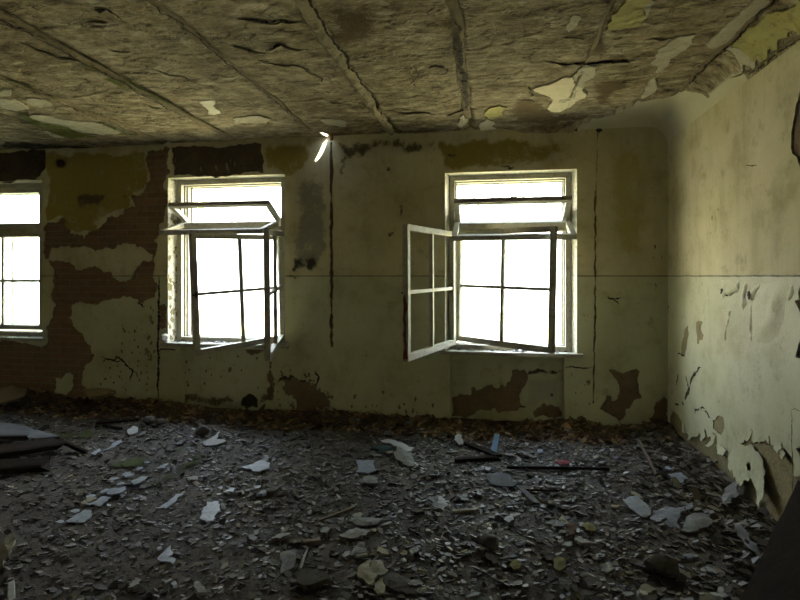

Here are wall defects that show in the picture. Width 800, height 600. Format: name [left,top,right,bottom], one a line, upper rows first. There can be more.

crack [0,9,237,146]
crack [147,0,477,136]
peeling [534,65,597,112]
spalling [0,143,264,400]
crack [101,356,138,382]
crack [137,275,175,397]
spalling [242,361,333,411]
spalling [452,369,562,419]
spalling [589,369,642,426]
spalling [649,397,800,521]